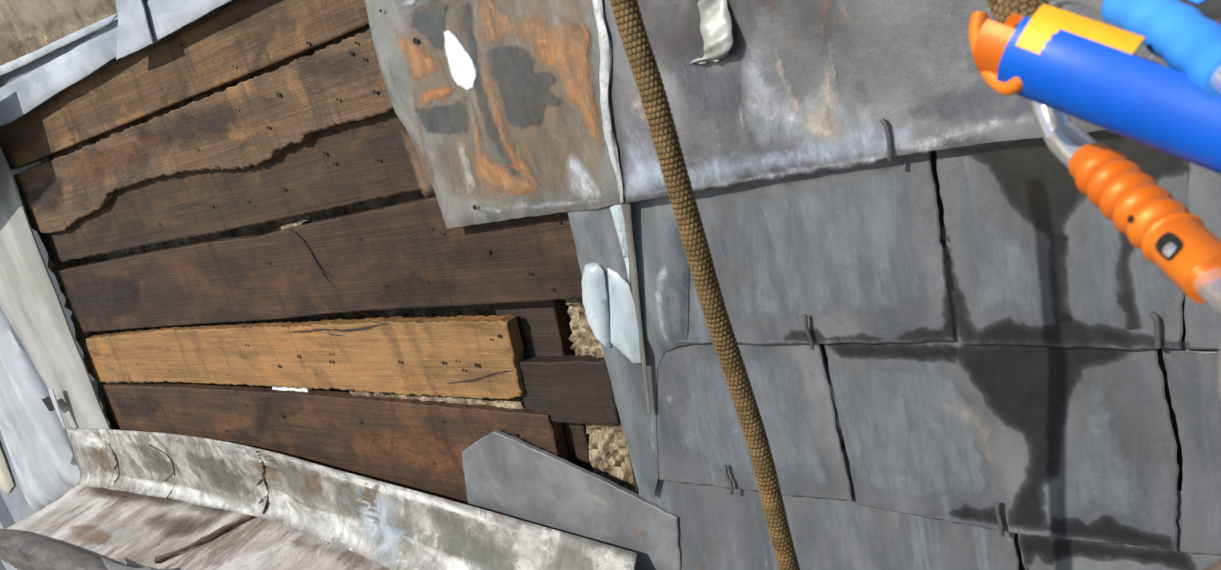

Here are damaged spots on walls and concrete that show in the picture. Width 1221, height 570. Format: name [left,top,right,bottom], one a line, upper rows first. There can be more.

corrosion [399,0,597,194]
water stain [1090,130,1187,179]
water stain [743,175,920,315]
water stain [684,362,753,472]
water stain [746,359,827,482]
water stain [786,140,1193,570]